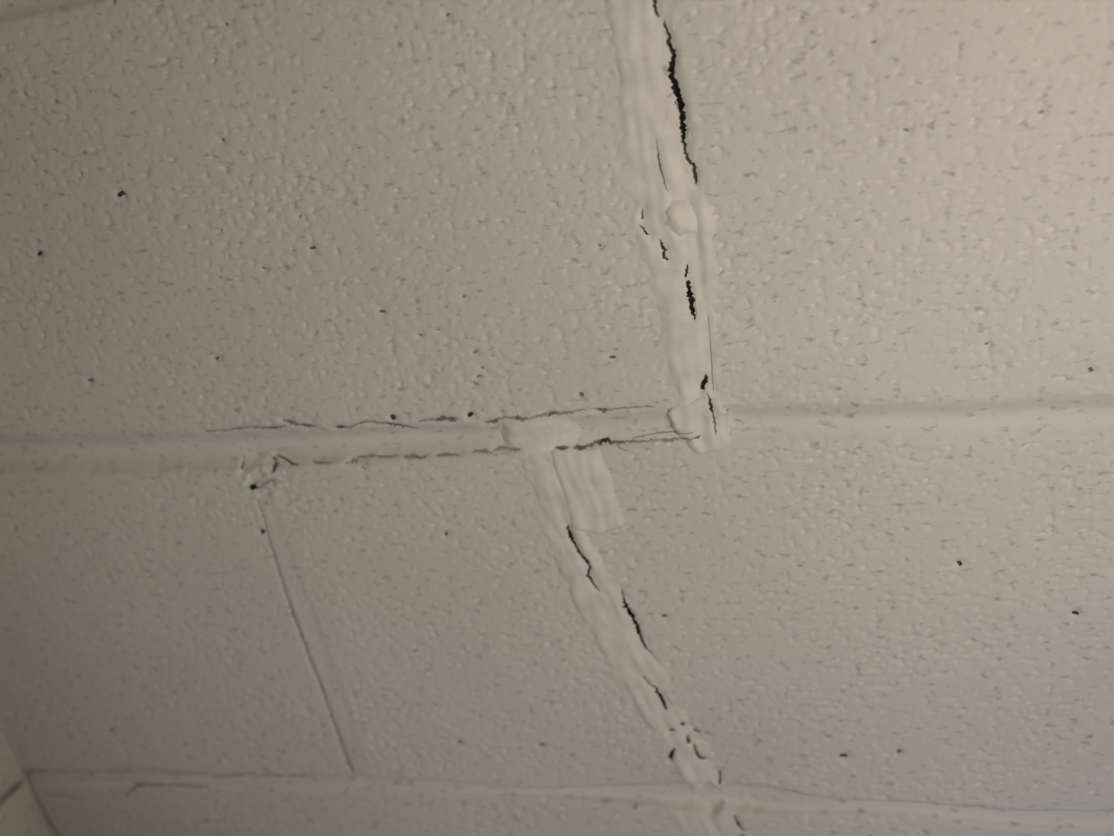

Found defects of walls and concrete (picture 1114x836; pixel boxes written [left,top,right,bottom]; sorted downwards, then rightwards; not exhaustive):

crack [652,0,698,192]
crack [206,209,717,470]
crack [564,525,722,784]
crack [734,815,747,836]